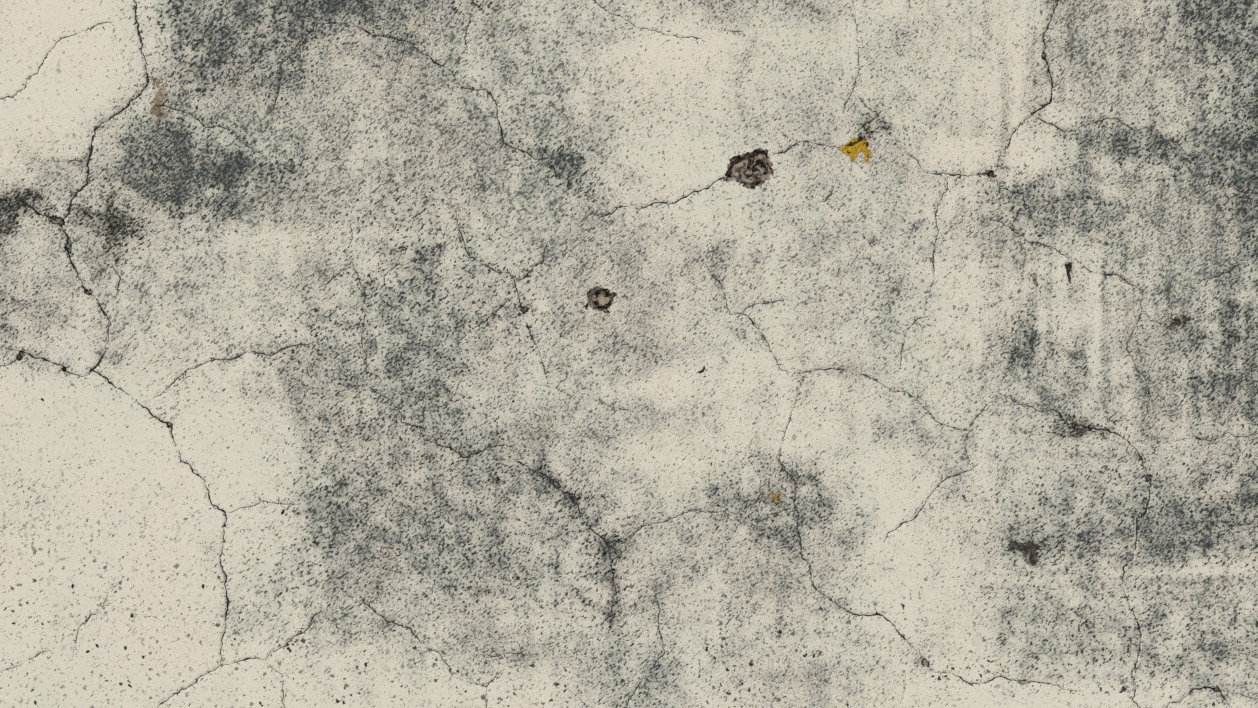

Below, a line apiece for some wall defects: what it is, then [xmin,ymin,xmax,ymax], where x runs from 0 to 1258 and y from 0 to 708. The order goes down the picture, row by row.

damp [0,275,46,365]
damp [0,0,505,268]
crack [0,0,556,708]
damp [204,167,726,708]
damp [511,132,603,210]
spalling [584,286,617,313]
spalling [723,148,774,189]
damp [683,448,862,573]
crack [325,0,1258,708]
damp [955,0,1258,701]